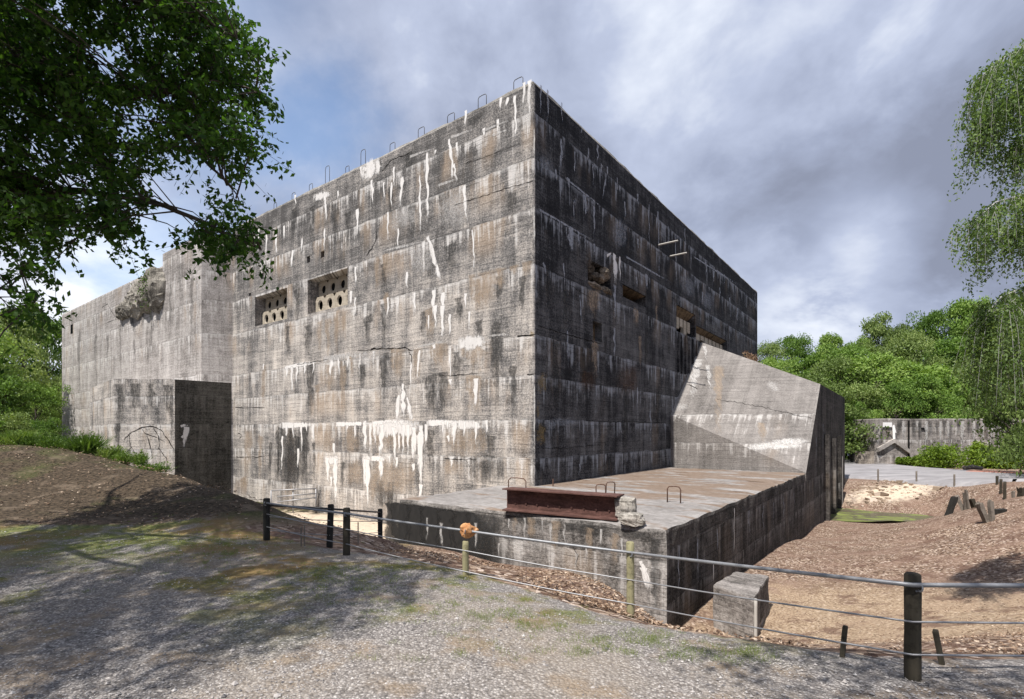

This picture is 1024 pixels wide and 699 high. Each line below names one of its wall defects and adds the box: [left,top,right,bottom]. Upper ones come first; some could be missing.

leakage [310,191,359,245]
leakage [533,139,738,321]
leakage [336,80,602,563]
crack [358,347,412,361]
leakage [690,346,711,388]
leakage [115,384,189,444]
leakage [750,437,817,452]